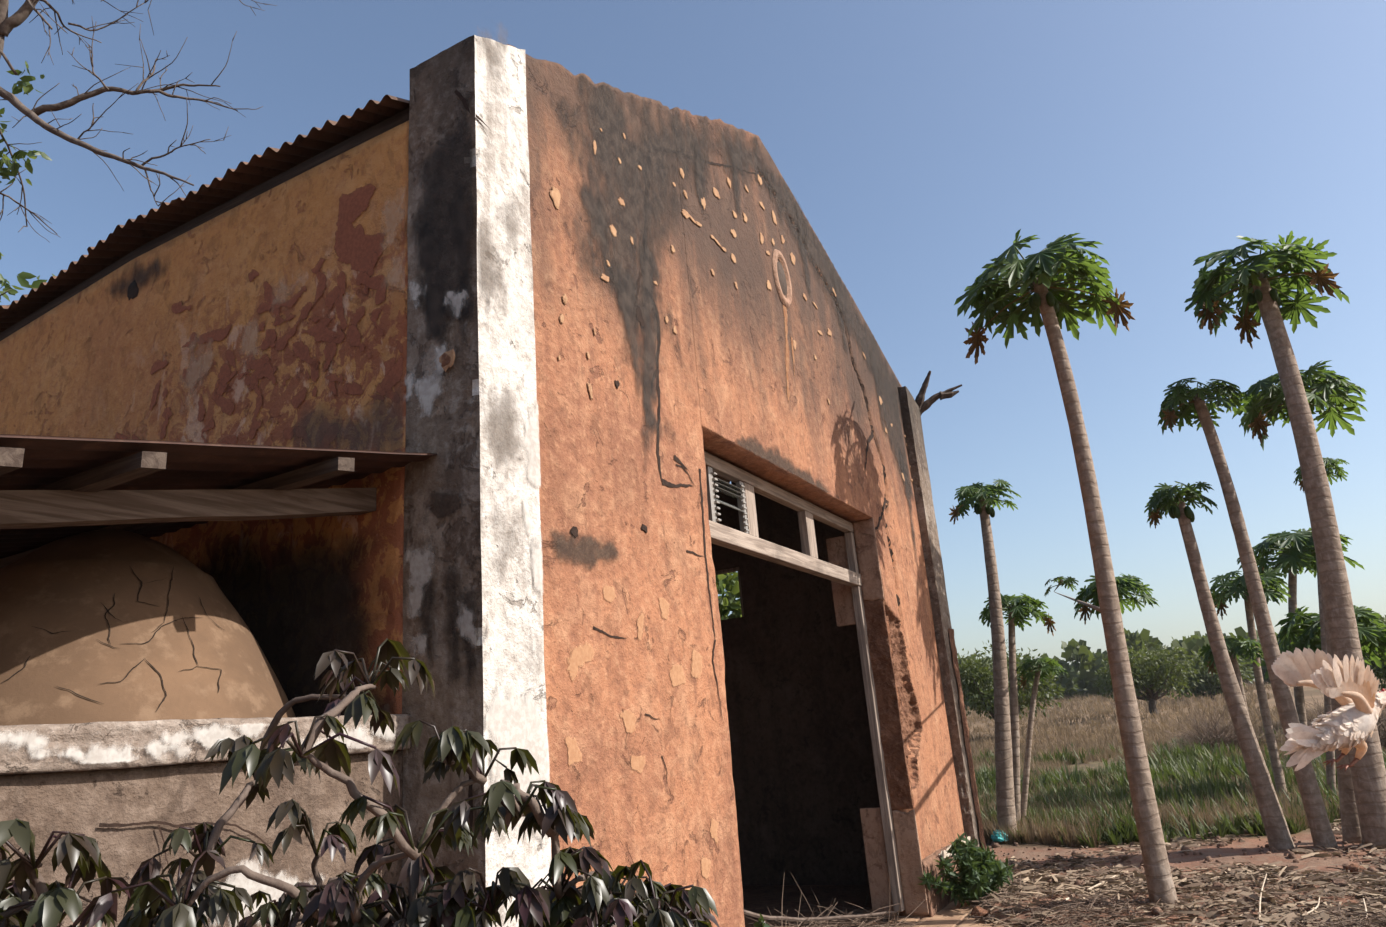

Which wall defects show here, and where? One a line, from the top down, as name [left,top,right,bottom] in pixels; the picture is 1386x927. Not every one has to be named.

flaking render [149,183,455,448]
leakage [413,95,490,349]
peeling [445,290,467,316]
leakage [571,76,915,545]
crack [0,567,224,735]
peeling [406,550,431,618]
leakage [430,493,461,519]
leakage [420,571,475,686]
peeling [458,609,476,644]
peeling [565,736,582,766]
crack [636,226,723,719]
spalling [863,599,923,810]